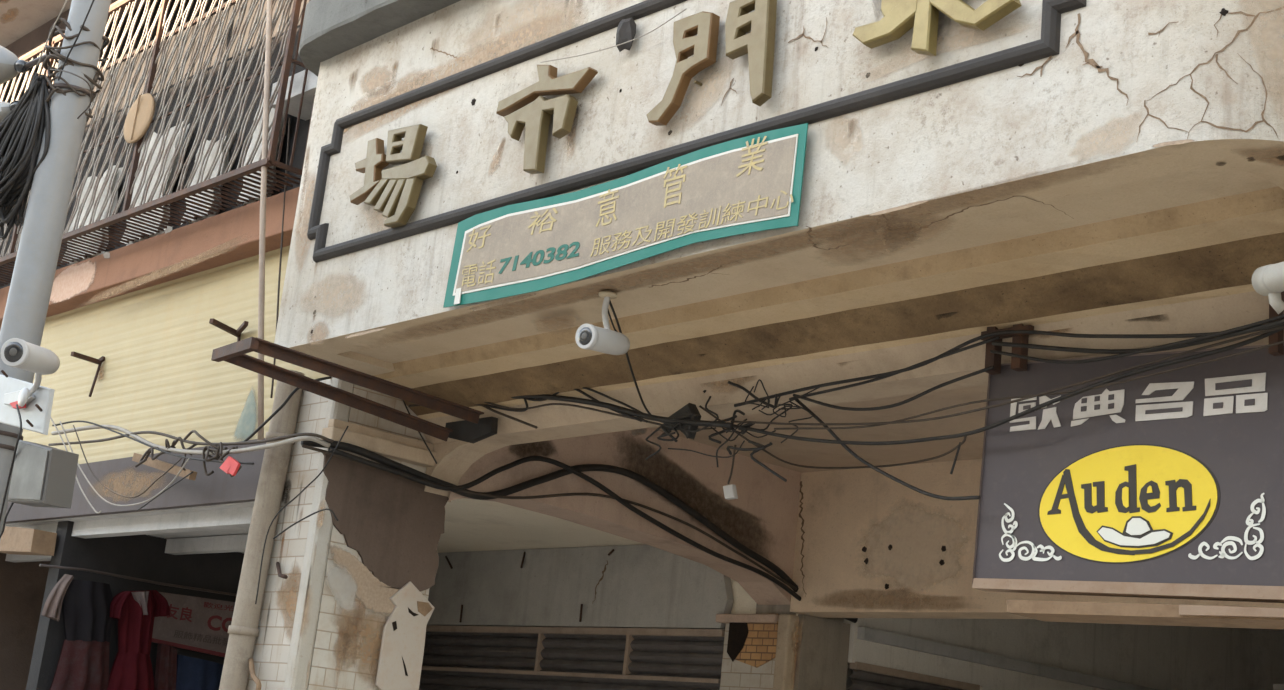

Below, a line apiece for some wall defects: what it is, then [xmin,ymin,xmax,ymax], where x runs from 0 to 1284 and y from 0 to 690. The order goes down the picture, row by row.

crack [1018,6,1284,139]
water stain [1247,150,1284,166]
water stain [510,441,554,457]
water stain [627,428,765,554]
peeling [328,545,401,614]
spalling [727,614,778,668]